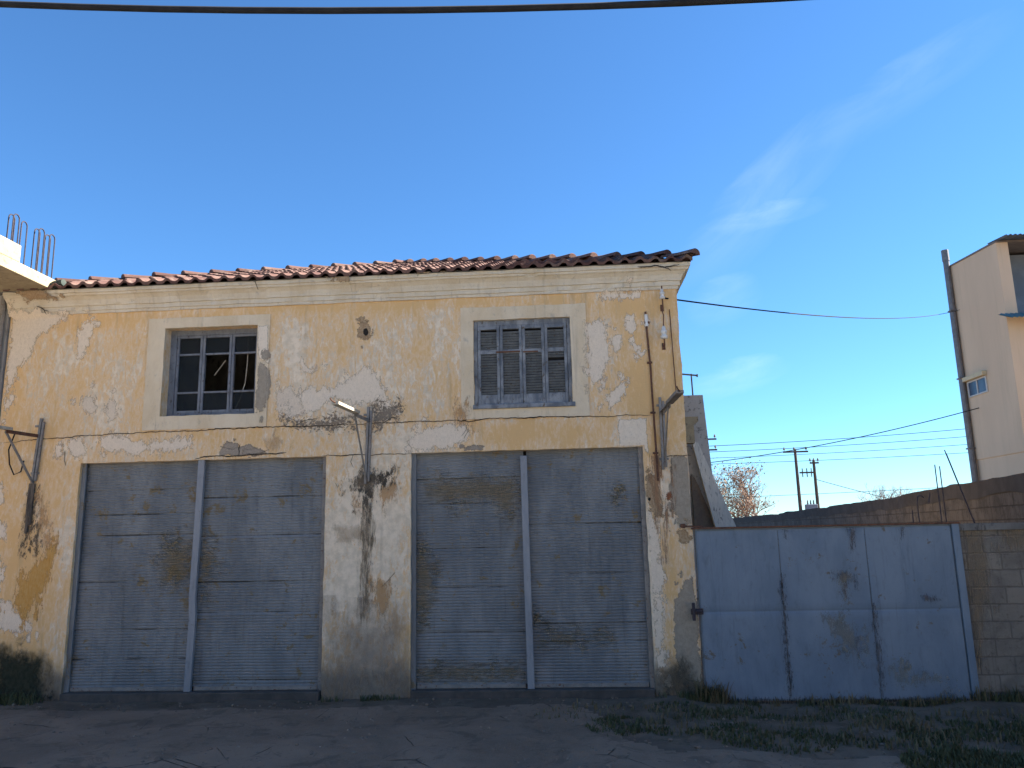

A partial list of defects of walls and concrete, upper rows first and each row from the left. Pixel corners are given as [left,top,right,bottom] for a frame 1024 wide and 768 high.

peeling [2,290,101,425]
peeling [255,325,405,435]
spalling [356,316,373,348]
peeling [582,277,651,411]
spalling [220,439,266,458]
peeling [618,418,649,453]
leakage [19,485,42,557]
leakage [336,465,398,620]
peeling [645,456,702,686]
leakage [0,646,51,701]